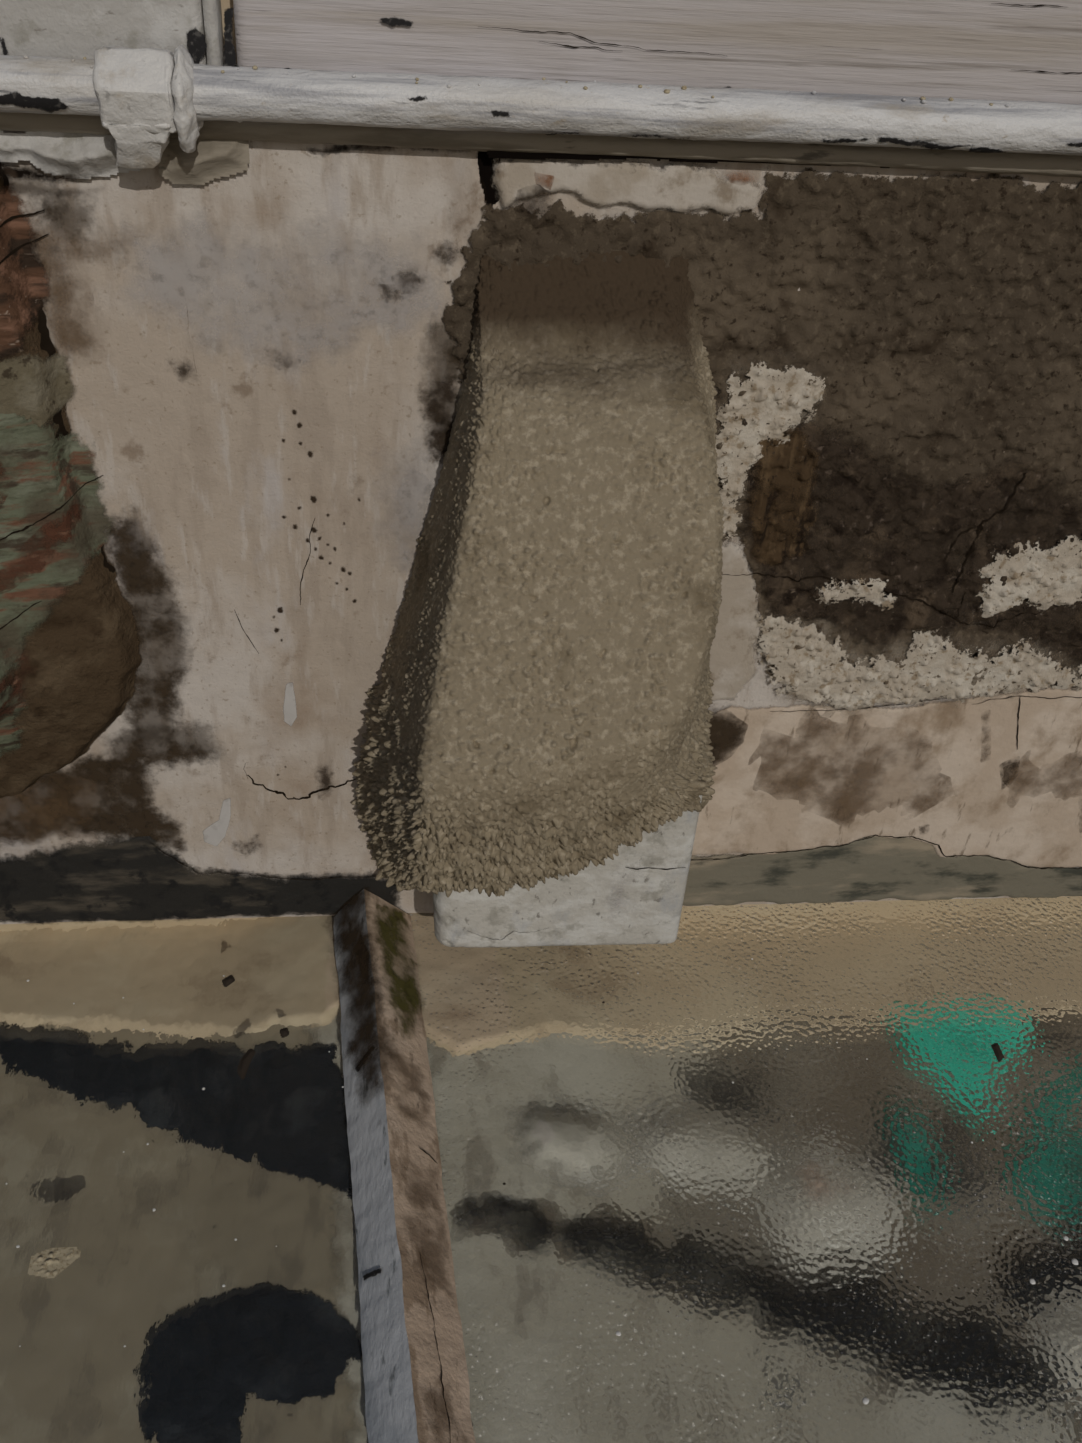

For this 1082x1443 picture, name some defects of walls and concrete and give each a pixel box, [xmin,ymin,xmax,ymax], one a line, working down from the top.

peeling [715,361,826,542]
water stain [0,504,85,592]
peeling [0,413,113,757]
peeling [816,577,898,611]
peeling [977,535,1082,618]
water stain [0,520,213,851]
peeling [755,613,1082,711]
crack [244,763,356,800]
water stain [708,714,746,764]
water stain [761,719,881,822]
water stain [1000,762,1028,786]